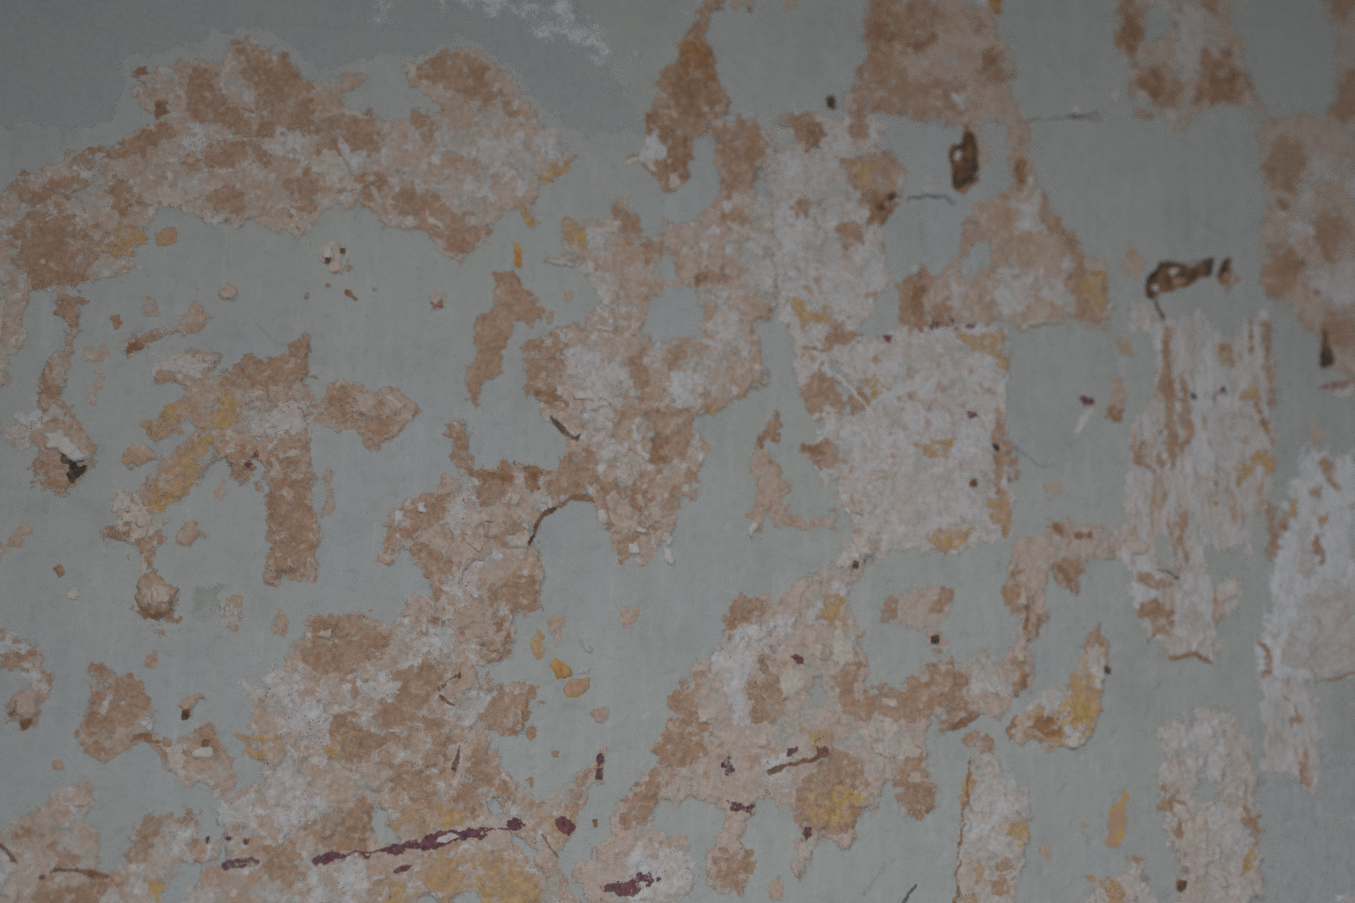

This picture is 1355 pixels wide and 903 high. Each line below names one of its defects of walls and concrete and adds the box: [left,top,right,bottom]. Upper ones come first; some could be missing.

peeling [0,0,1034,903]
peeling [571,297,1355,903]
peeling [921,127,1117,334]
peeling [1112,0,1355,379]